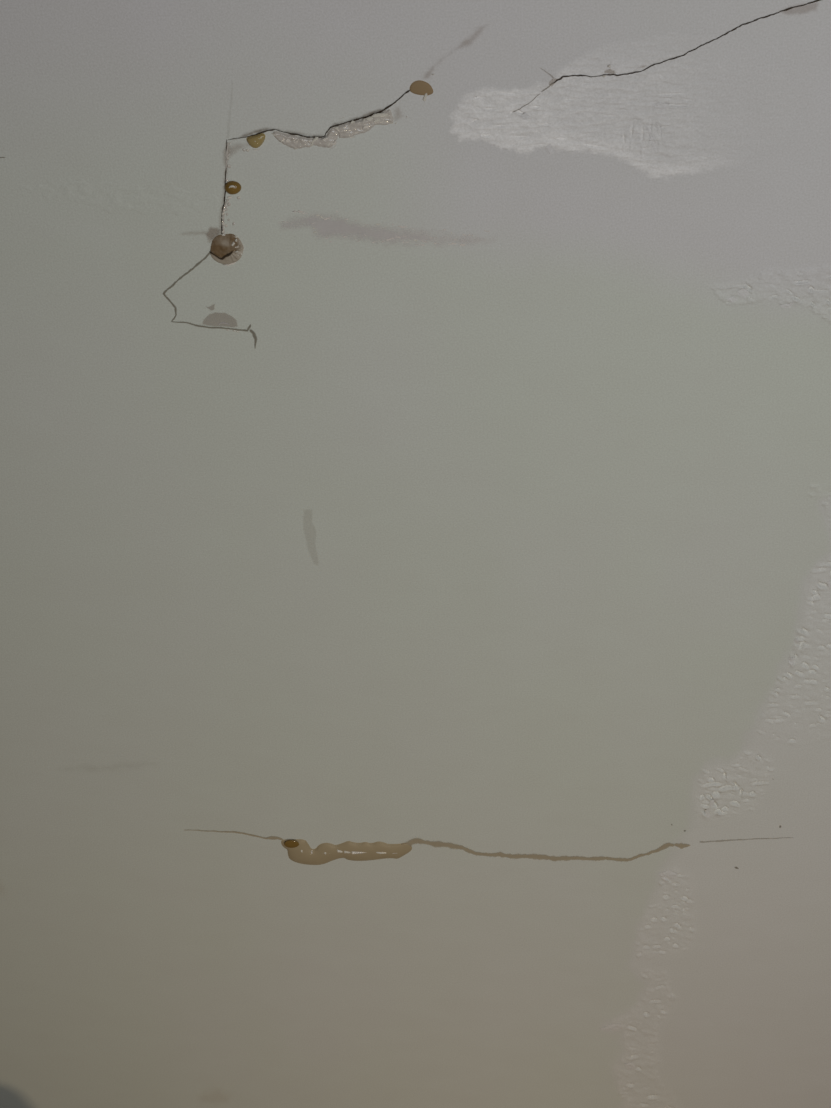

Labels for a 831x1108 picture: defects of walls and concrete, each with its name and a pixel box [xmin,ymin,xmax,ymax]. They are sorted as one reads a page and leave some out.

spalling [444,26,809,183]
crack [513,0,820,112]
crack [163,90,410,347]
crack [194,830,283,840]
crack [406,839,690,861]